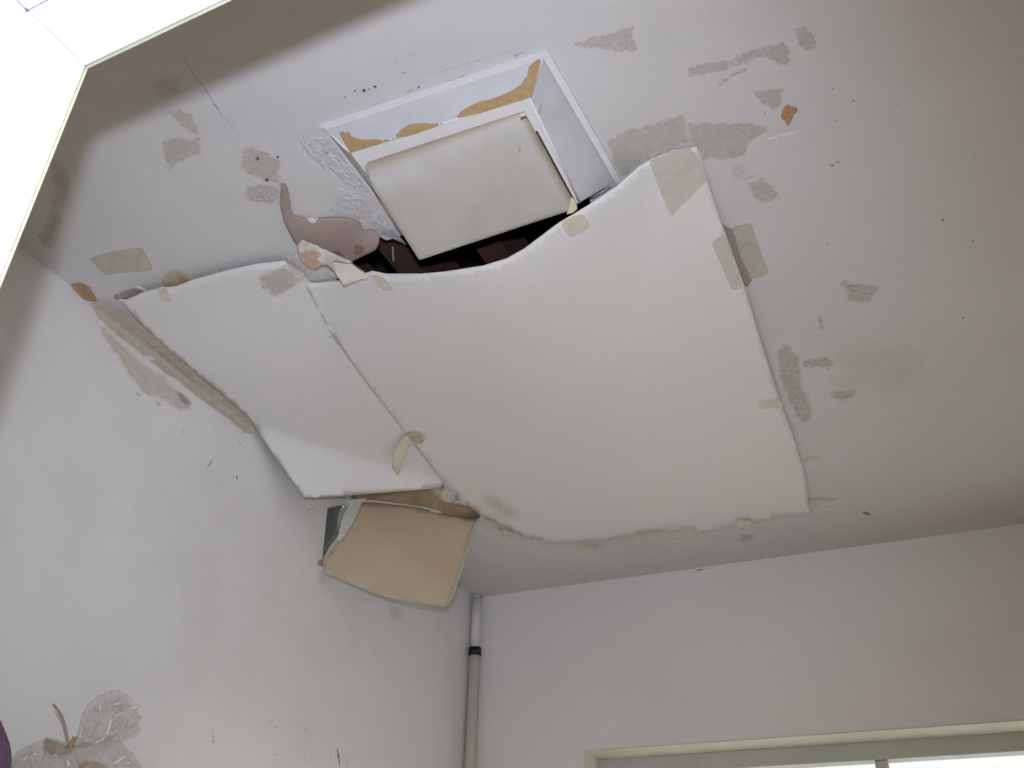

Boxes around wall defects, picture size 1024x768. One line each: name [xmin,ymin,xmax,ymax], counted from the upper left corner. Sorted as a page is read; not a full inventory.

peeling [280,183,379,287]